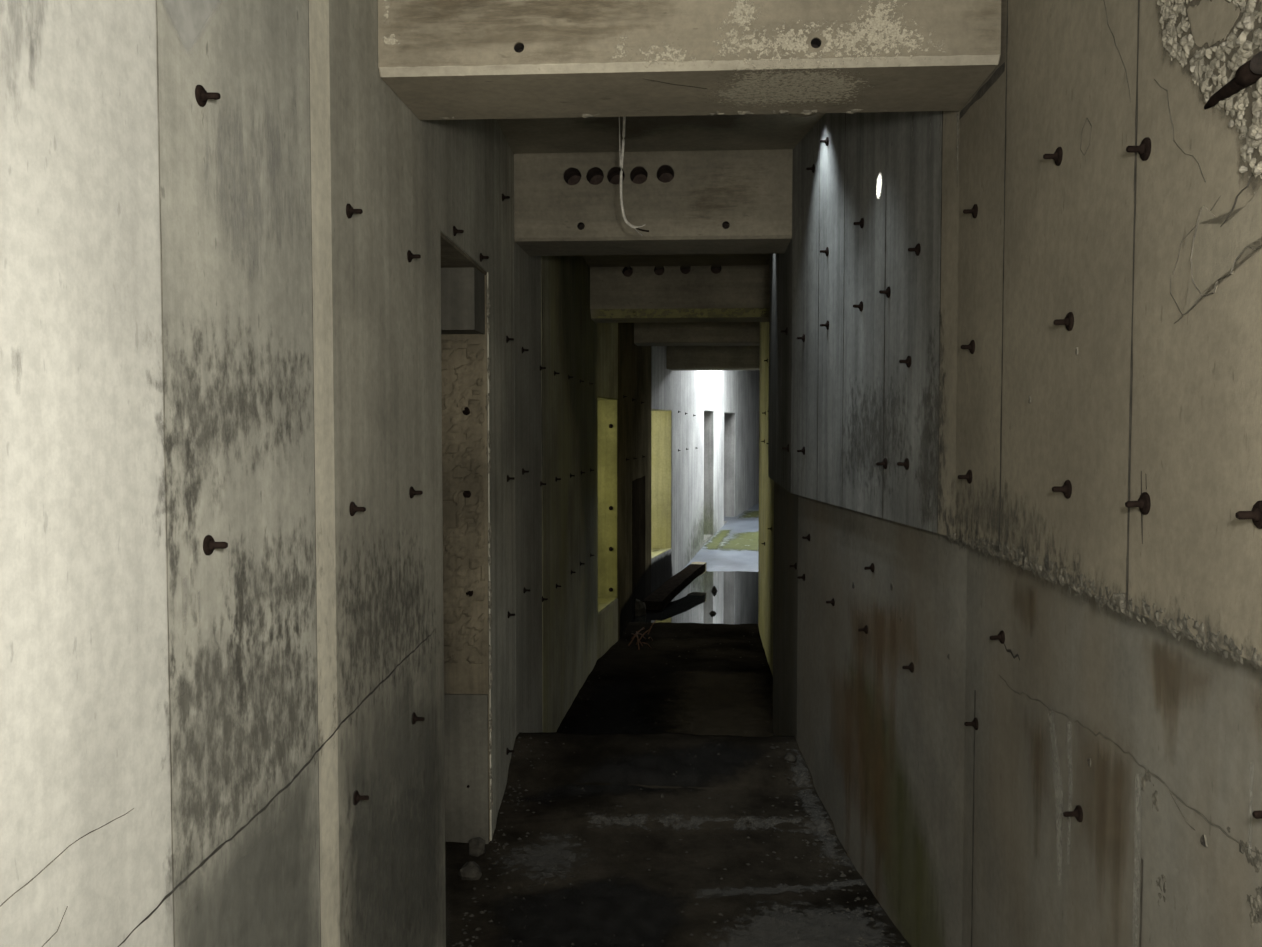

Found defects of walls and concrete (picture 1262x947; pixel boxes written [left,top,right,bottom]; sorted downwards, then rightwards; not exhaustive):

peeling [699,0,946,116]
crack [1104,2,1221,274]
spalling [1157,0,1262,323]
damp [161,341,301,532]
crack [42,906,68,947]
crack [0,808,134,907]
damp [174,537,320,860]
crack [118,632,433,947]
crack [1000,644,1262,855]